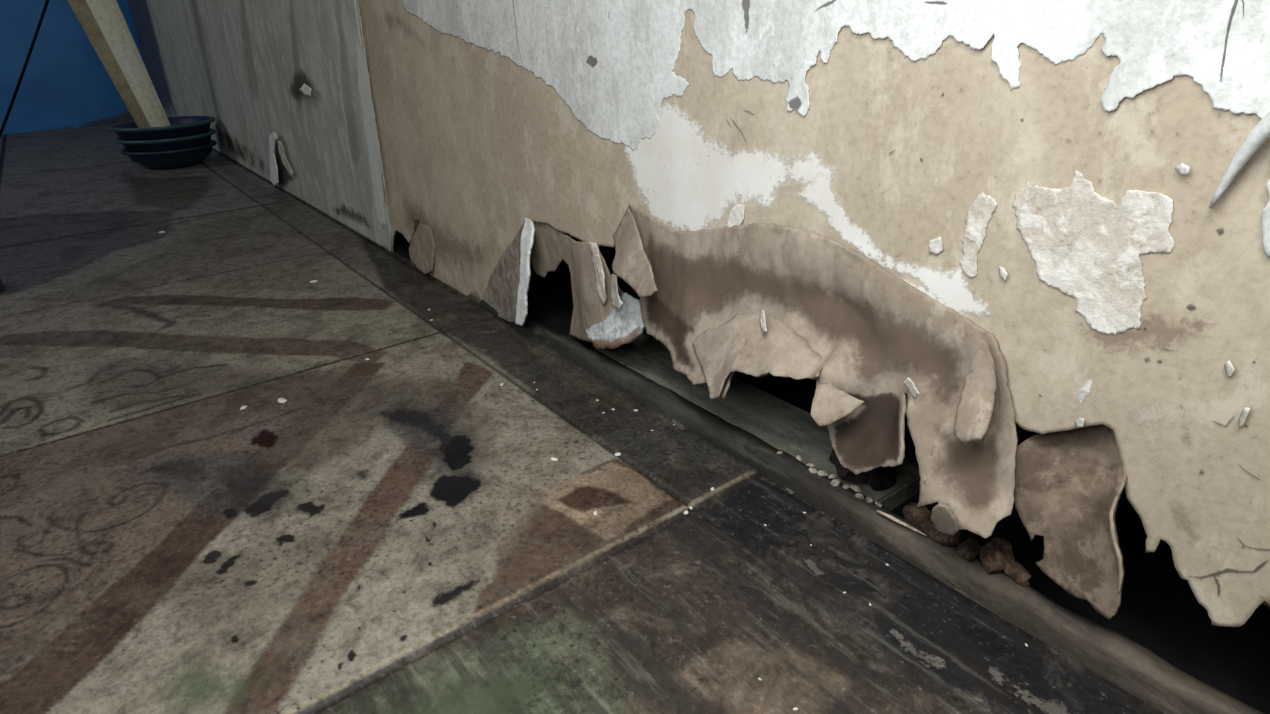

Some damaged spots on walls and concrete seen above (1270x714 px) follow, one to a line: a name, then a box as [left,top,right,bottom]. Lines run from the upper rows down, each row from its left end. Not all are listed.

peeling [401,0,1270,335]
spalling [585,292,645,343]
peeling [904,377,920,399]
peeling [1045,380,1092,428]
peeling [1224,360,1235,378]